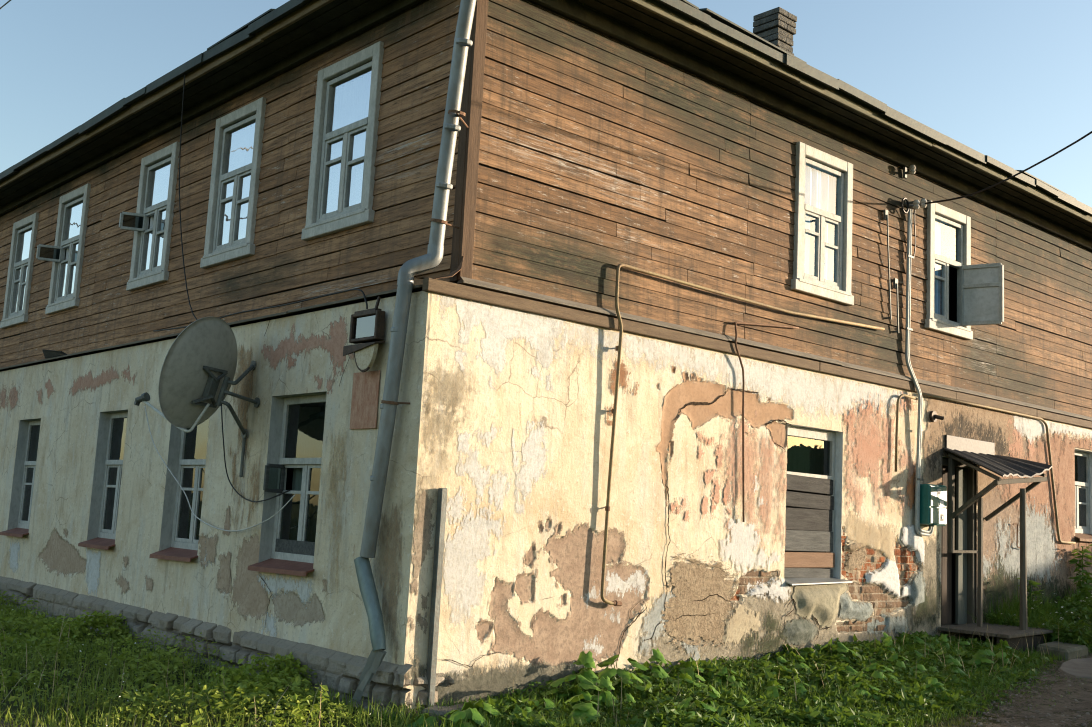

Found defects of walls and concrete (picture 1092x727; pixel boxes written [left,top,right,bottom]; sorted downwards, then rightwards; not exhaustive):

peeling [69,365,137,395]
water stain [424,361,458,442]
crack [677,387,758,418]
water stain [927,409,1012,476]
flaking render [38,528,87,576]
flaking render [198,505,327,628]
water stain [379,504,584,706]
flaking render [408,421,650,670]
crack [574,483,731,668]
flaking render [656,366,793,653]
crack [757,594,830,638]
peeling [836,391,925,637]